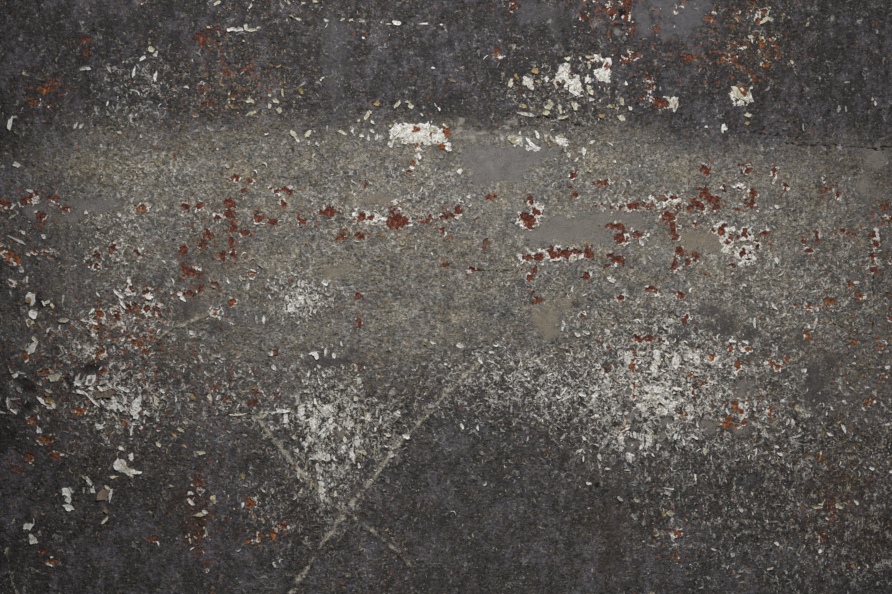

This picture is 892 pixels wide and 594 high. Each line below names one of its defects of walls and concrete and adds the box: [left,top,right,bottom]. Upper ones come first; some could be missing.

corrosion [579,0,636,35]
corrosion [579,49,643,66]
corrosion [719,33,782,82]
peeling [491,19,632,217]
peeling [669,88,685,113]
corrosion [0,189,70,222]
corrosion [316,196,464,241]
corrosion [515,194,545,231]
corrosion [592,161,771,275]
corrosion [837,204,892,275]
corrosion [86,173,278,375]
corrosion [516,243,594,305]